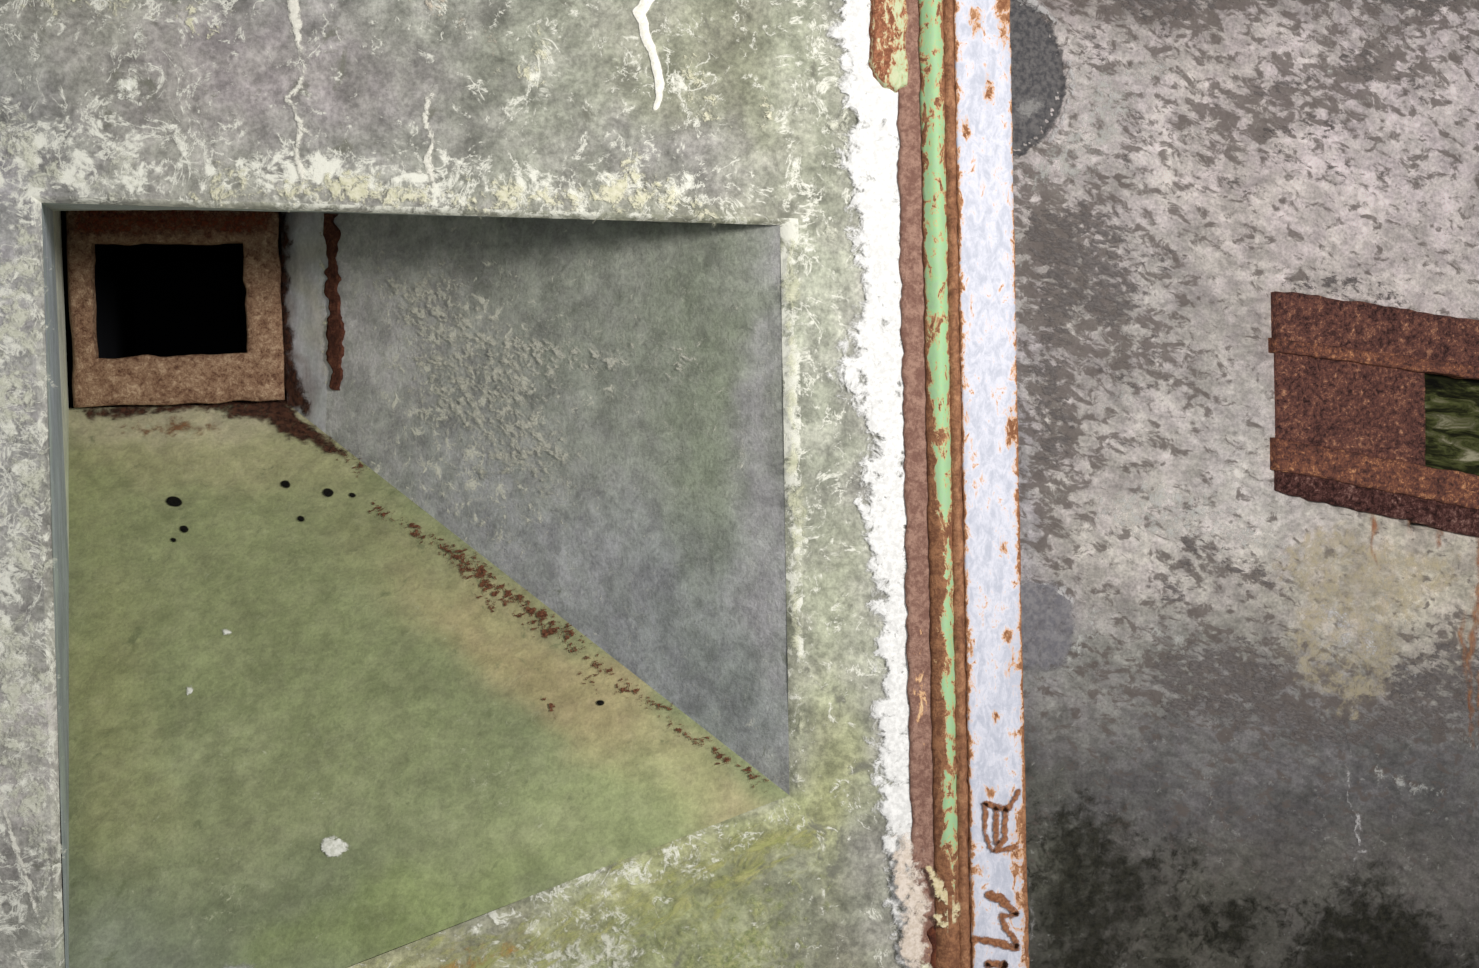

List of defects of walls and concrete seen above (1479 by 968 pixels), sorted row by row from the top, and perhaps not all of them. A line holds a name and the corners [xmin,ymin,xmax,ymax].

spalling [1010,0,1076,156]
corrosion [83,212,370,473]
corrosion [368,502,769,788]
corrosion [927,925,937,968]
leakage [1029,790,1161,968]
leakage [1156,898,1277,968]
leakage [1281,863,1449,968]